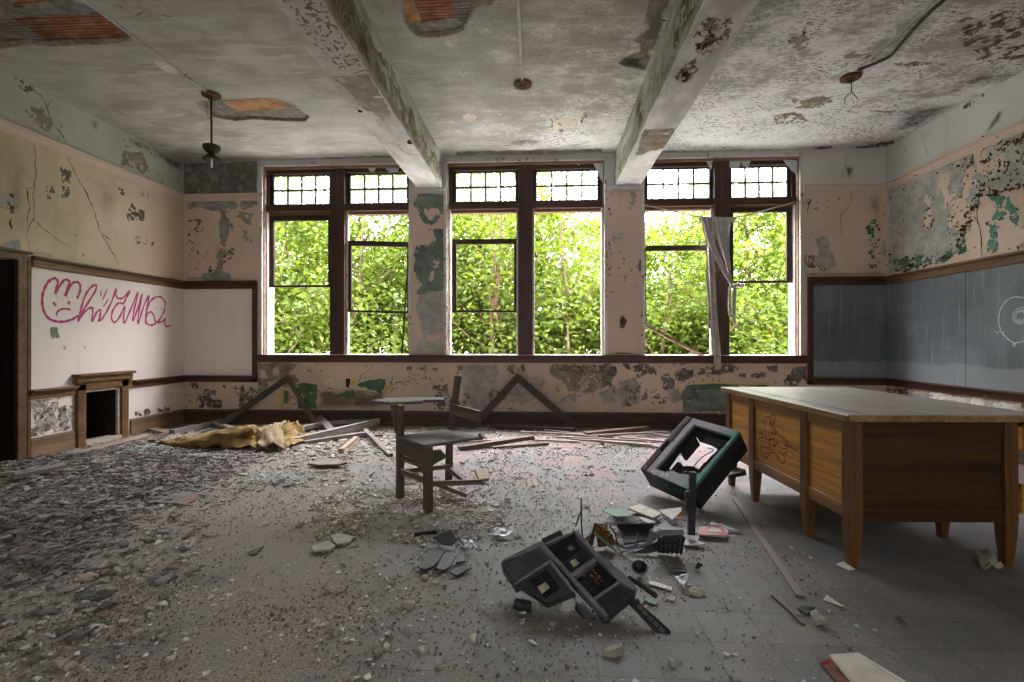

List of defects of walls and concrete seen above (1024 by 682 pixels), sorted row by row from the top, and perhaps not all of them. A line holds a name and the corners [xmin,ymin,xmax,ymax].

spalling [0,0,132,50]
spalling [399,0,494,39]
spalling [195,98,311,122]
peeling [272,0,442,177]
peeling [615,0,698,181]
peeling [771,96,833,125]
crack [9,147,69,256]
crack [30,85,119,265]
peeling [185,201,258,281]
peeling [866,131,1024,274]
peeling [406,194,690,410]
flaking render [30,397,76,437]